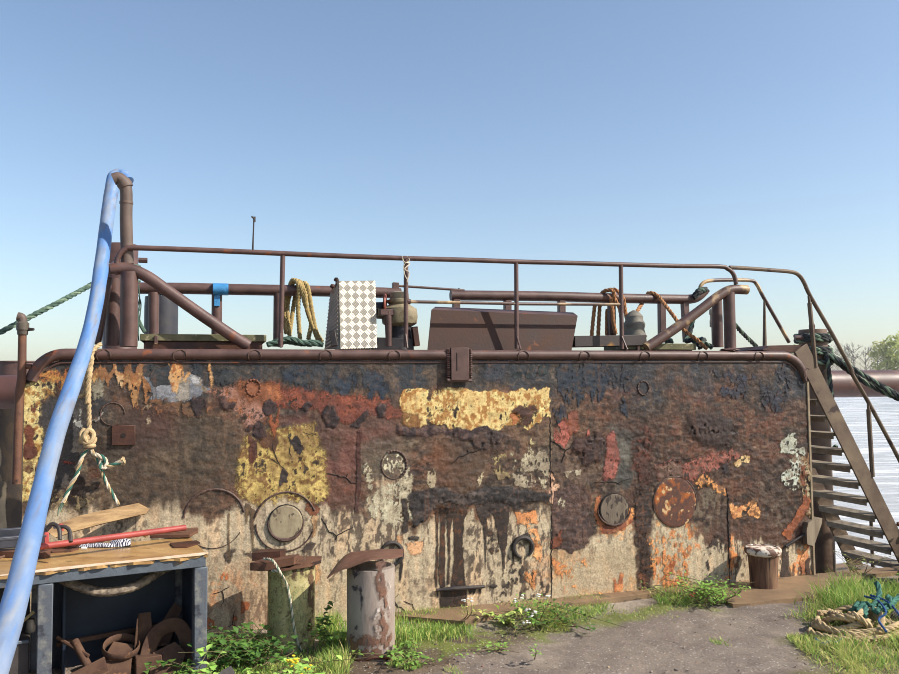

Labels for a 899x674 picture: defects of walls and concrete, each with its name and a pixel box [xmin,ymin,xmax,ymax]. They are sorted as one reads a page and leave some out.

peeling [142,372,590,528]
peeling [603,431,620,482]
peeling [780,433,805,491]
leakage [401,498,422,534]
corrosion [695,474,761,519]
corrosion [782,453,812,540]
leakage [434,502,550,608]
corrosion [649,535,690,588]